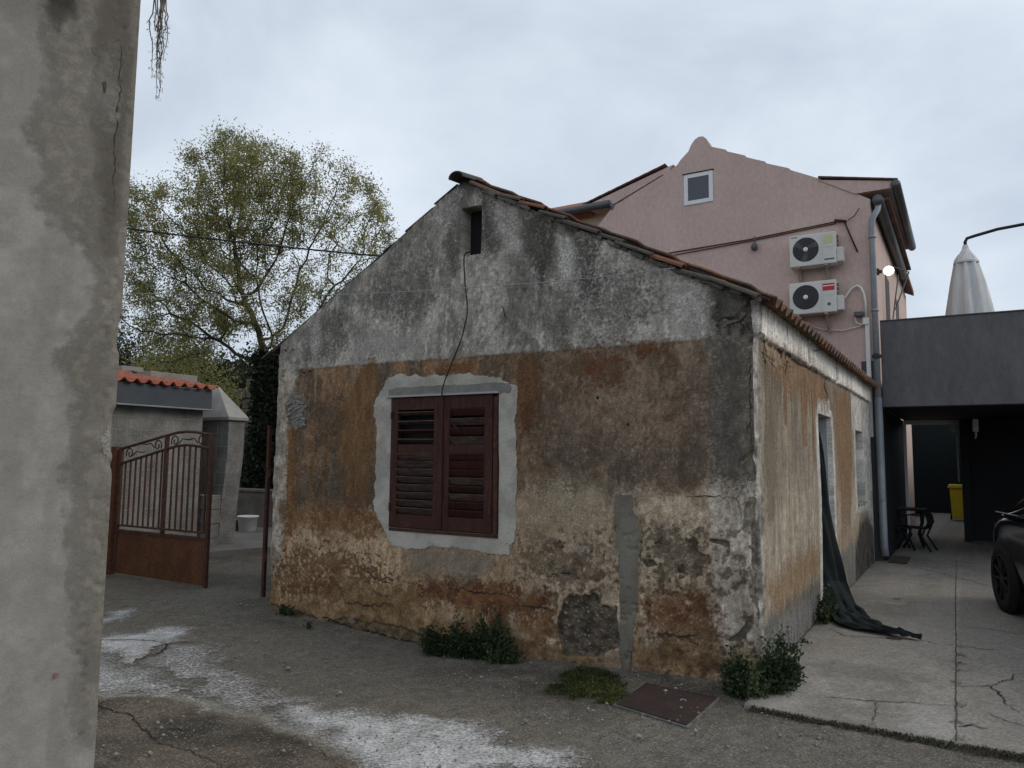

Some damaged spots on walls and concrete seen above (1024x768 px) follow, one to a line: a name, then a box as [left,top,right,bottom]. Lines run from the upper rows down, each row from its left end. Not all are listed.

crack [113,45,122,210]
water stain [25,0,141,745]
water stain [481,192,779,543]
spalling [502,531,622,669]
peeling [636,510,730,595]
spalling [743,497,759,617]
water stain [768,581,820,652]
water stain [855,516,875,580]